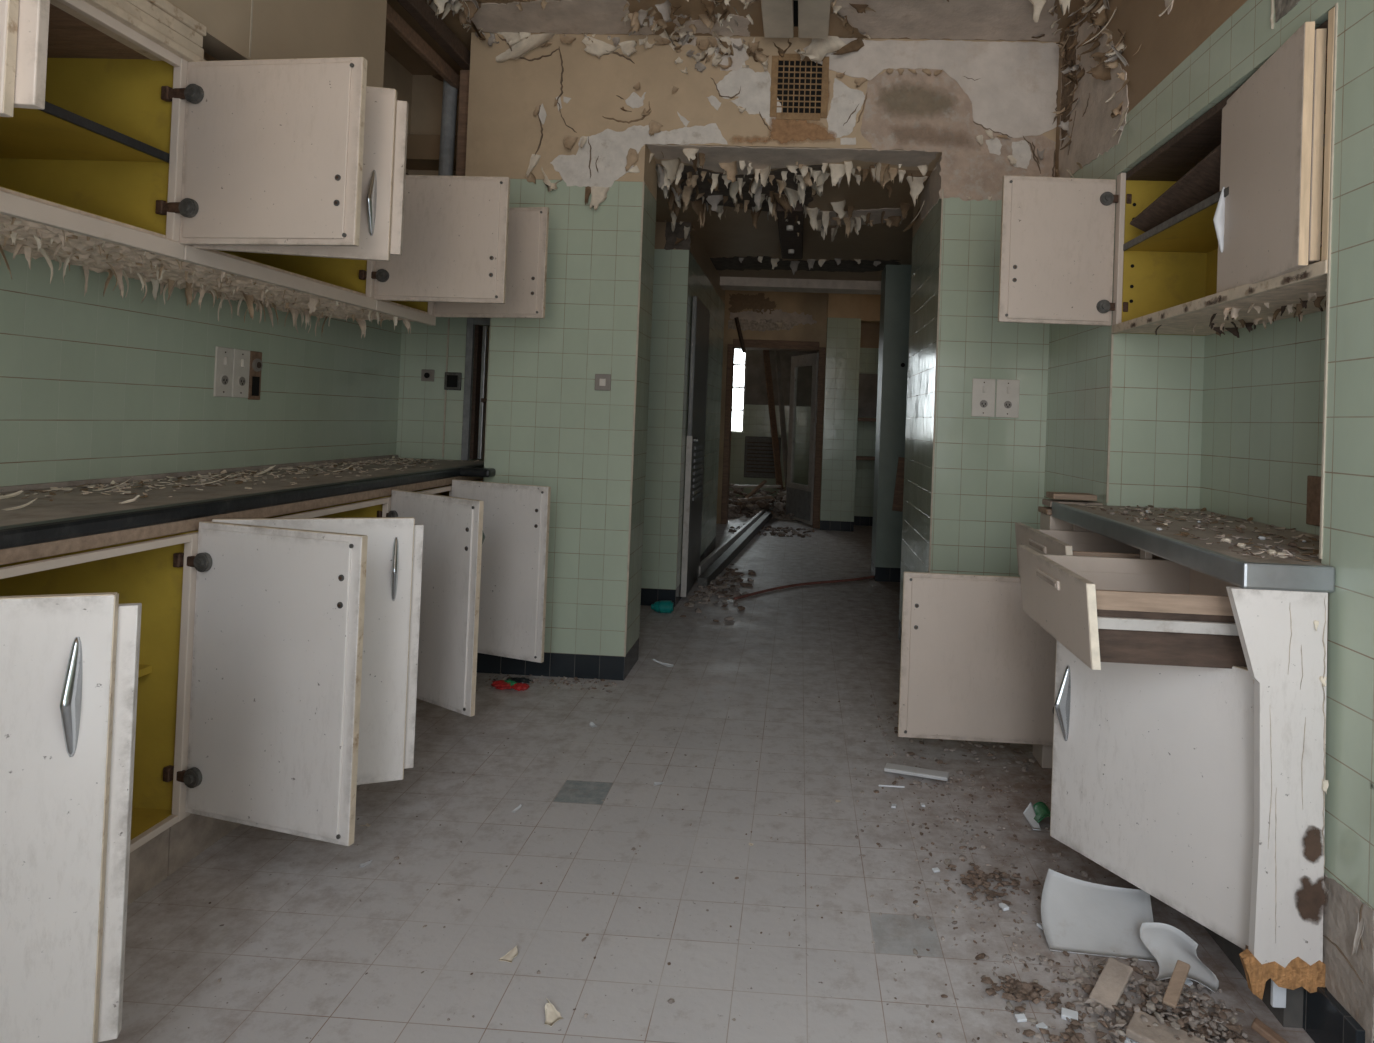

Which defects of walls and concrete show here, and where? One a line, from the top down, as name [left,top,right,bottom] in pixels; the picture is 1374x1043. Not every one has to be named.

peeling [427,0,1141,275]
peeling [1159,0,1174,16]